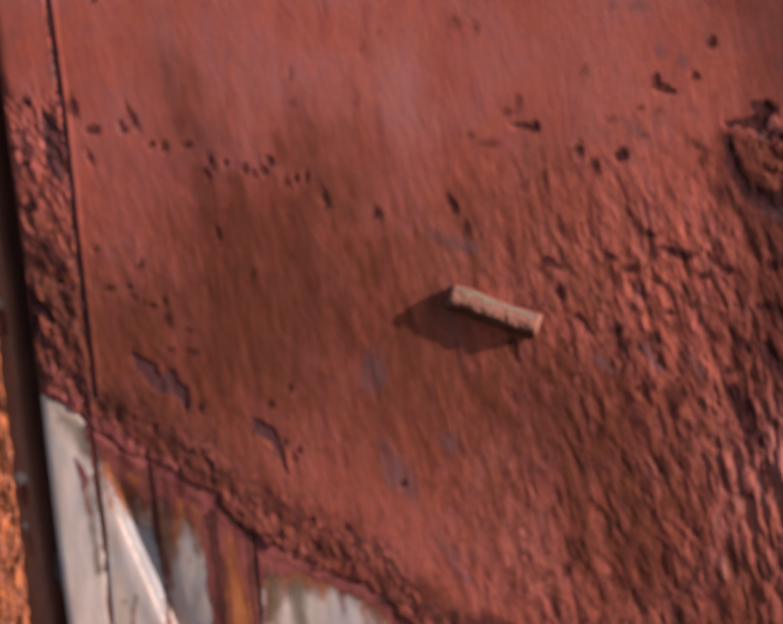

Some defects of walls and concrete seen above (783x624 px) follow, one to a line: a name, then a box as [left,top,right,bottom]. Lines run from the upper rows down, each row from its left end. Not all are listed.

rust [719,100,783,283]
peeling [54,552,64,592]
rust [40,363,408,624]
peeling [249,417,287,474]